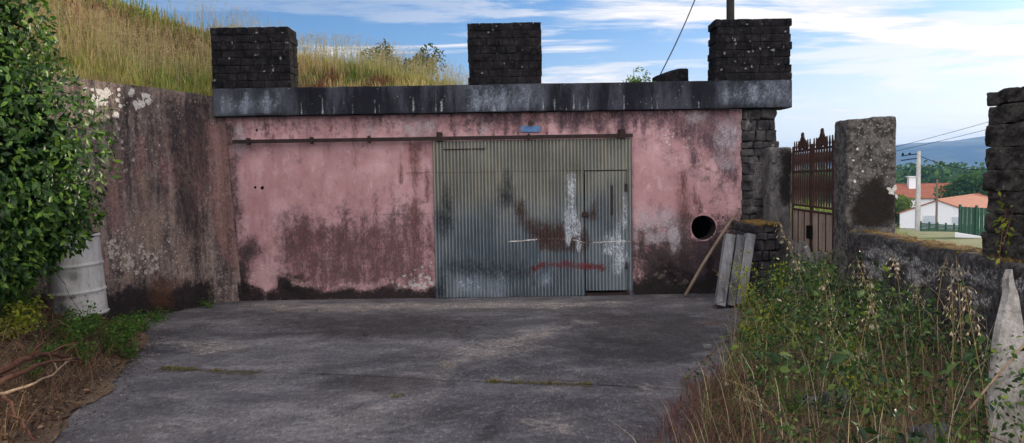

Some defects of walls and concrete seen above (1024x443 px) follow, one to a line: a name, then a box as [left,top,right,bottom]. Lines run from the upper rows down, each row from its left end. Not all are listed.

flaking render [83,87,204,275]
water stain [101,277,215,320]
water stain [152,98,209,250]
water stain [226,123,436,301]
rust [517,199,589,251]
water stain [452,89,742,295]